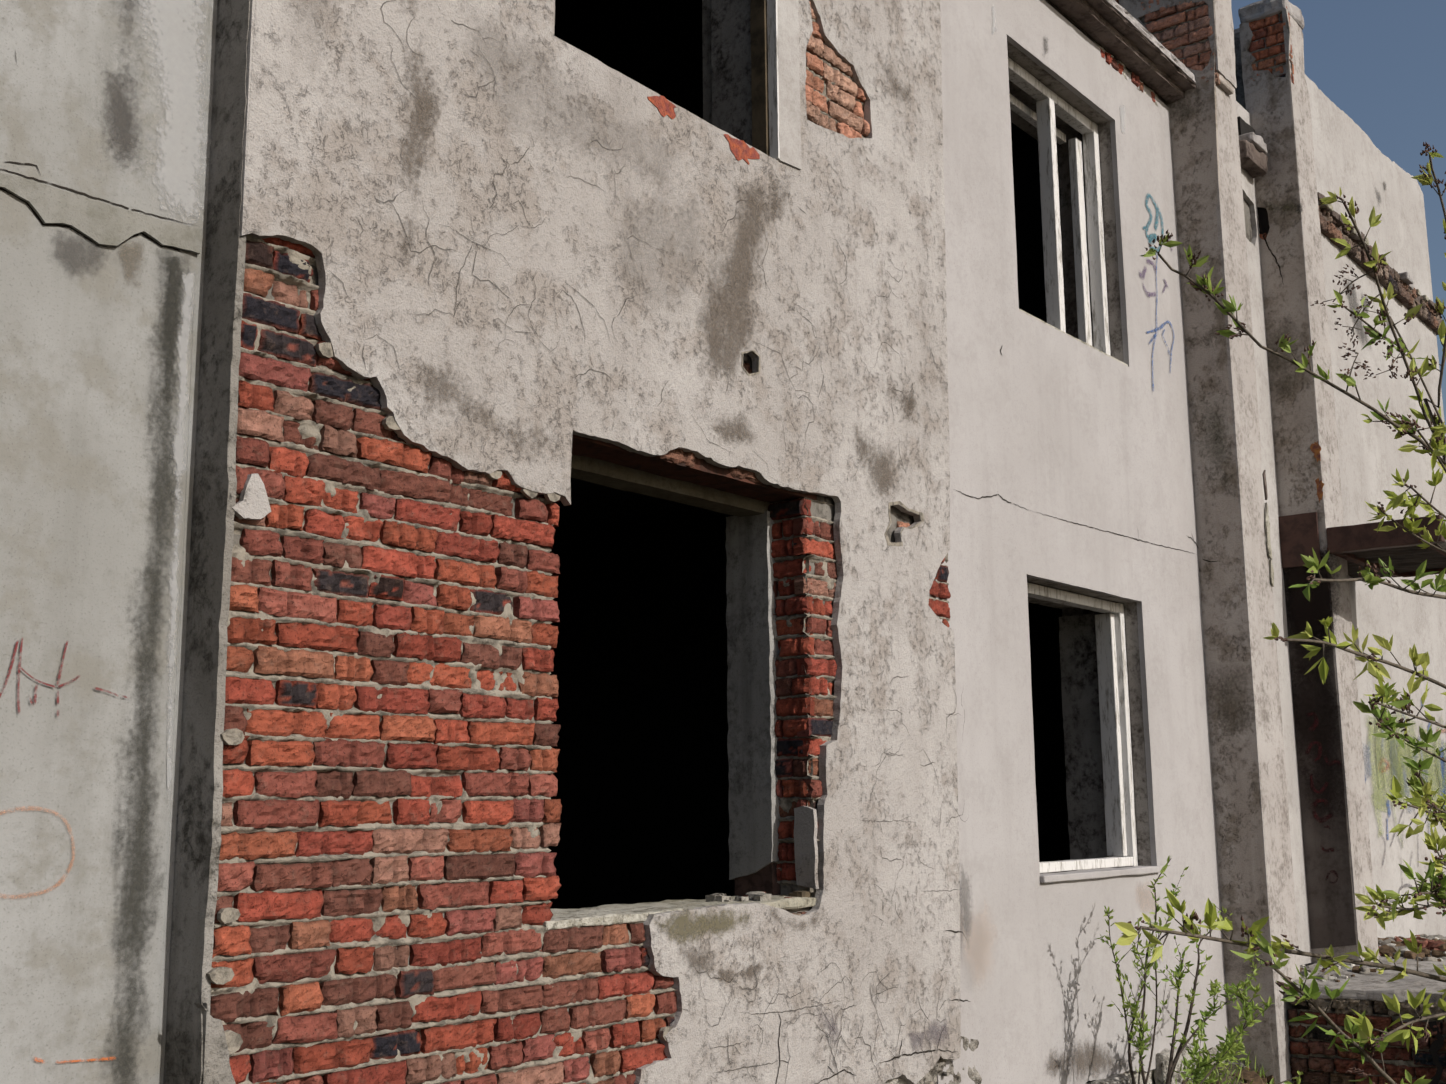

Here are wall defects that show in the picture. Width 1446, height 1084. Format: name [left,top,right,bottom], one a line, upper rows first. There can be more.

water stain [143,0,206,222]
water stain [403,53,436,182]
spalling [805,1,870,138]
spalling [1141,0,1221,86]
crack [0,161,197,226]
crack [359,138,636,387]
water stain [704,179,782,371]
water stain [109,257,193,1084]
spalling [206,235,677,1084]
spalling [928,553,951,627]
crack [953,489,1217,562]
crack [679,937,970,1084]